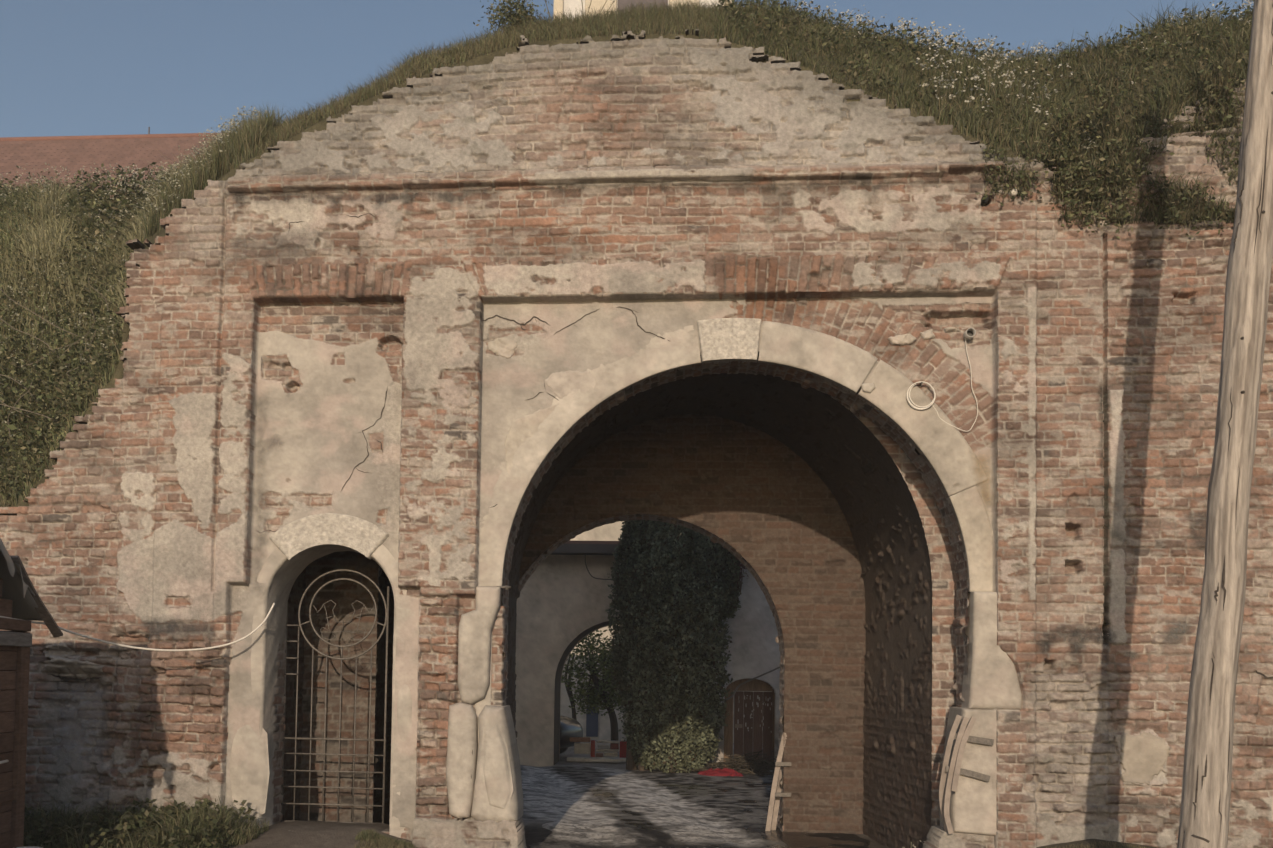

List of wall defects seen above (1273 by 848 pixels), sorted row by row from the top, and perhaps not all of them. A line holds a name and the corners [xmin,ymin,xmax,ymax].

crack [483,306,669,341]
crack [341,387,388,491]
peeling [254,297,481,544]
spalling [162,595,191,610]
spalling [41,626,229,814]
spalling [1027,658,1187,829]